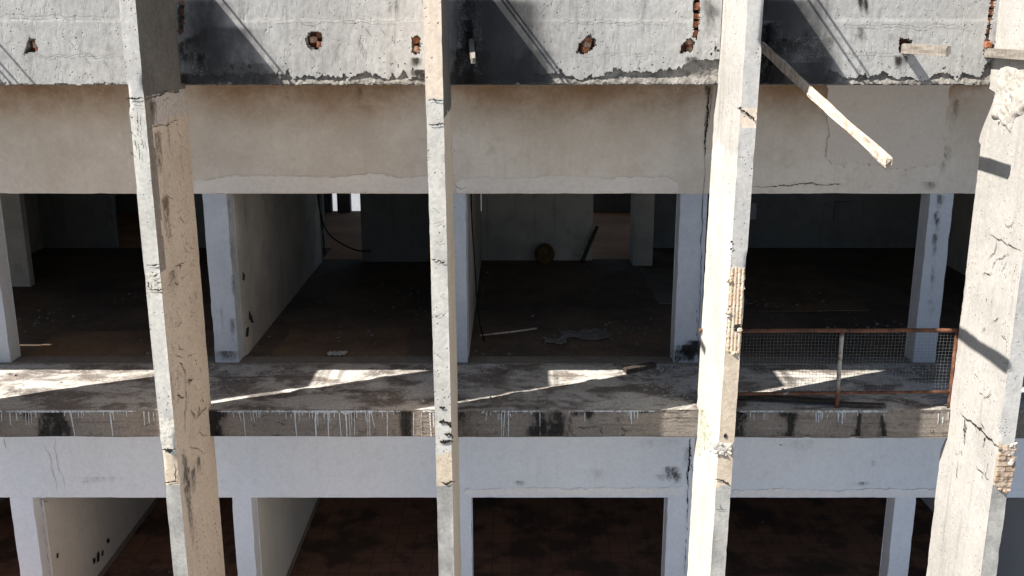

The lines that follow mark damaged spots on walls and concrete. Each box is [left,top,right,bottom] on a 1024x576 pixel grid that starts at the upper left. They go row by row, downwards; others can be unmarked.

damp [177,1,255,84]
spalling [450,2,719,85]
crack [755,181,842,189]
crack [696,75,755,363]
spalling [725,267,745,355]
damp [0,410,154,436]
damp [209,410,434,436]
damp [484,410,654,436]
crack [659,410,711,568]
damp [735,410,893,445]
crack [930,414,1000,480]
spalling [994,441,1017,494]